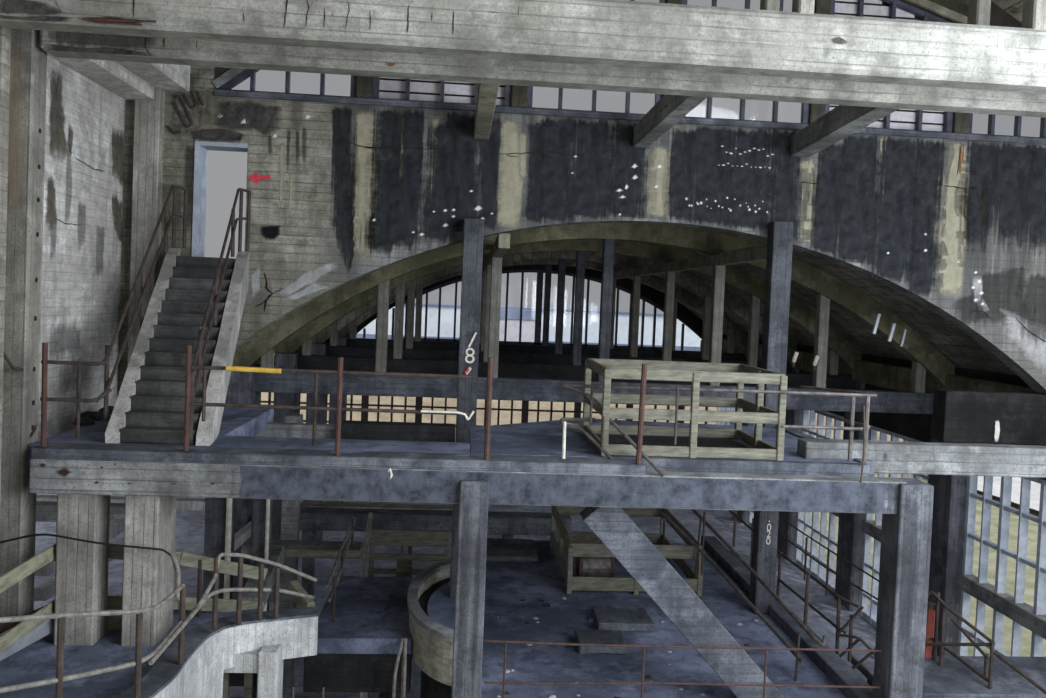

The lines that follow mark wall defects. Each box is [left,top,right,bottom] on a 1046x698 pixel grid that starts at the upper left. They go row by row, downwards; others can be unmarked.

damp [331,107,1046,295]
peeling [251,269,260,297]
peeling [281,264,334,299]
peeling [972,271,987,307]
crack [972,310,1046,342]
peeling [1008,317,1046,370]